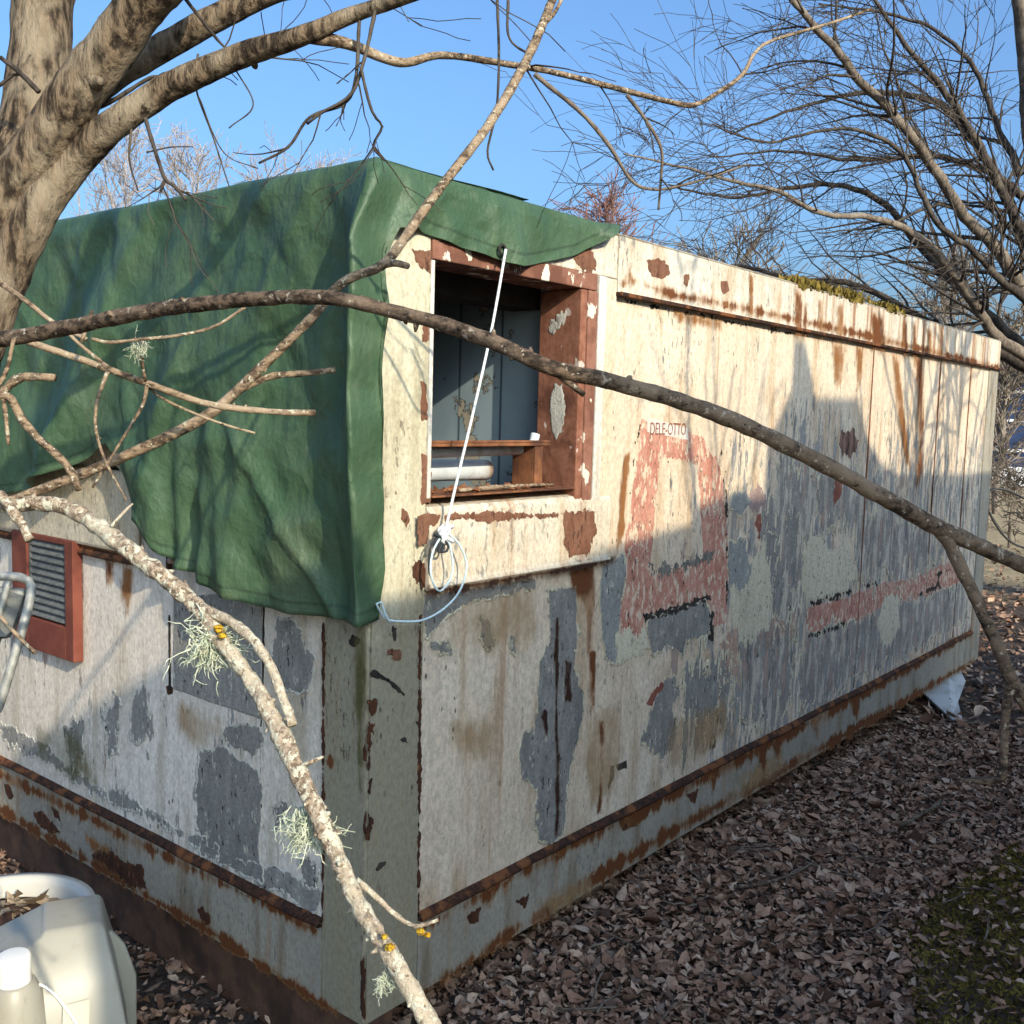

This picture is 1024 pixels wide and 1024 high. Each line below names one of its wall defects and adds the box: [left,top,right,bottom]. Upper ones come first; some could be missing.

peeling [548,310,567,335]
peeling [550,383,566,440]
corrosion [623,258,1000,483]
peeling [0,594,321,914]
corrosion [0,770,337,1015]
corrosion [321,622,333,802]
corrosion [441,922,519,983]
peeling [423,578,585,847]
corrosion [464,618,972,925]
peeling [599,453,969,775]